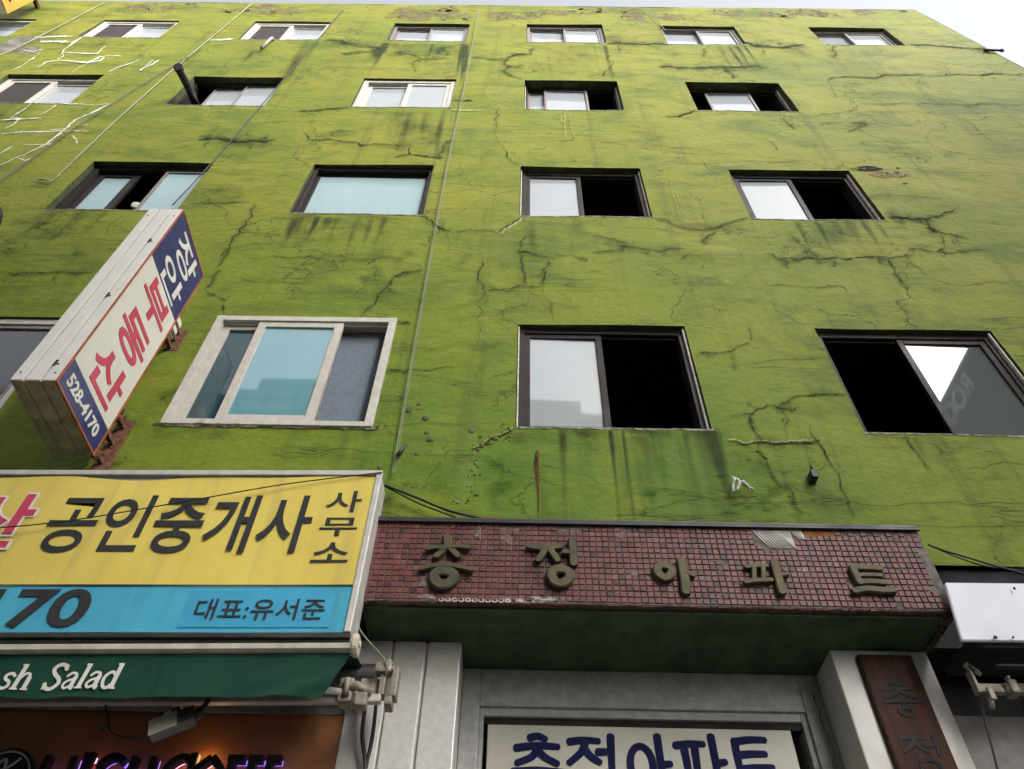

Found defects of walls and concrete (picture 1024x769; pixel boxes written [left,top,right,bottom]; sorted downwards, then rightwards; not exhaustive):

crack [603,42,803,78]
crack [453,99,519,165]
crack [197,201,419,316]
crack [423,214,747,347]
crack [739,206,995,326]
water stain [609,430,627,461]
water stain [703,431,725,480]
crack [728,393,856,517]